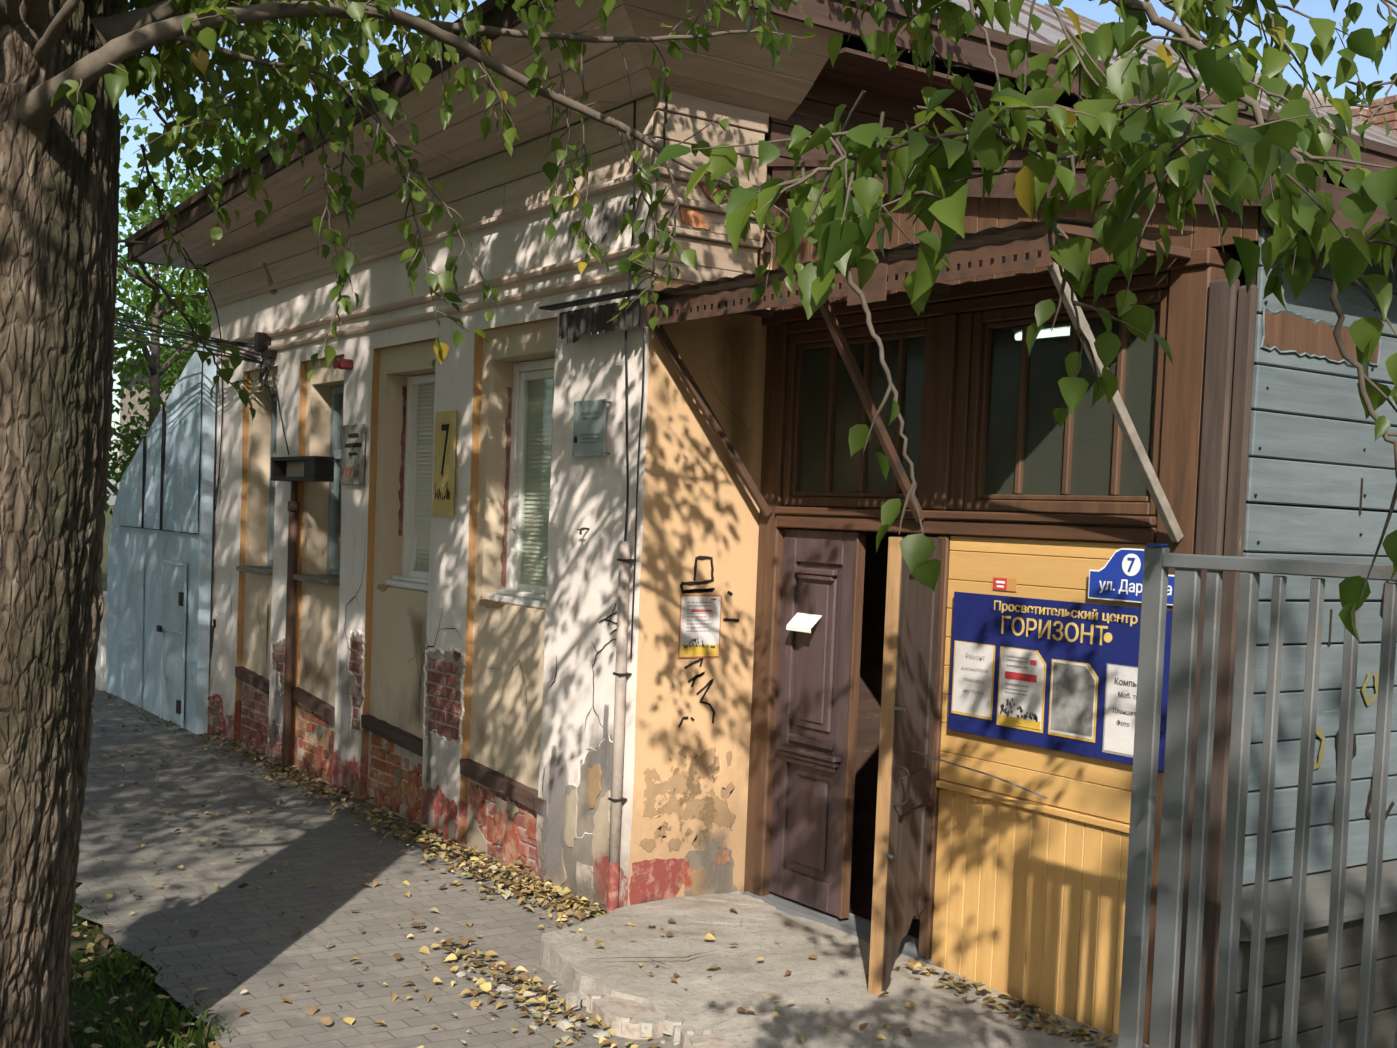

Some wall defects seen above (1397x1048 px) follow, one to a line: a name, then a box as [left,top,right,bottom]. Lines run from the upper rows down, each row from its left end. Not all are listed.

flaking render [207,630,624,914]
peeling [629,744,738,905]